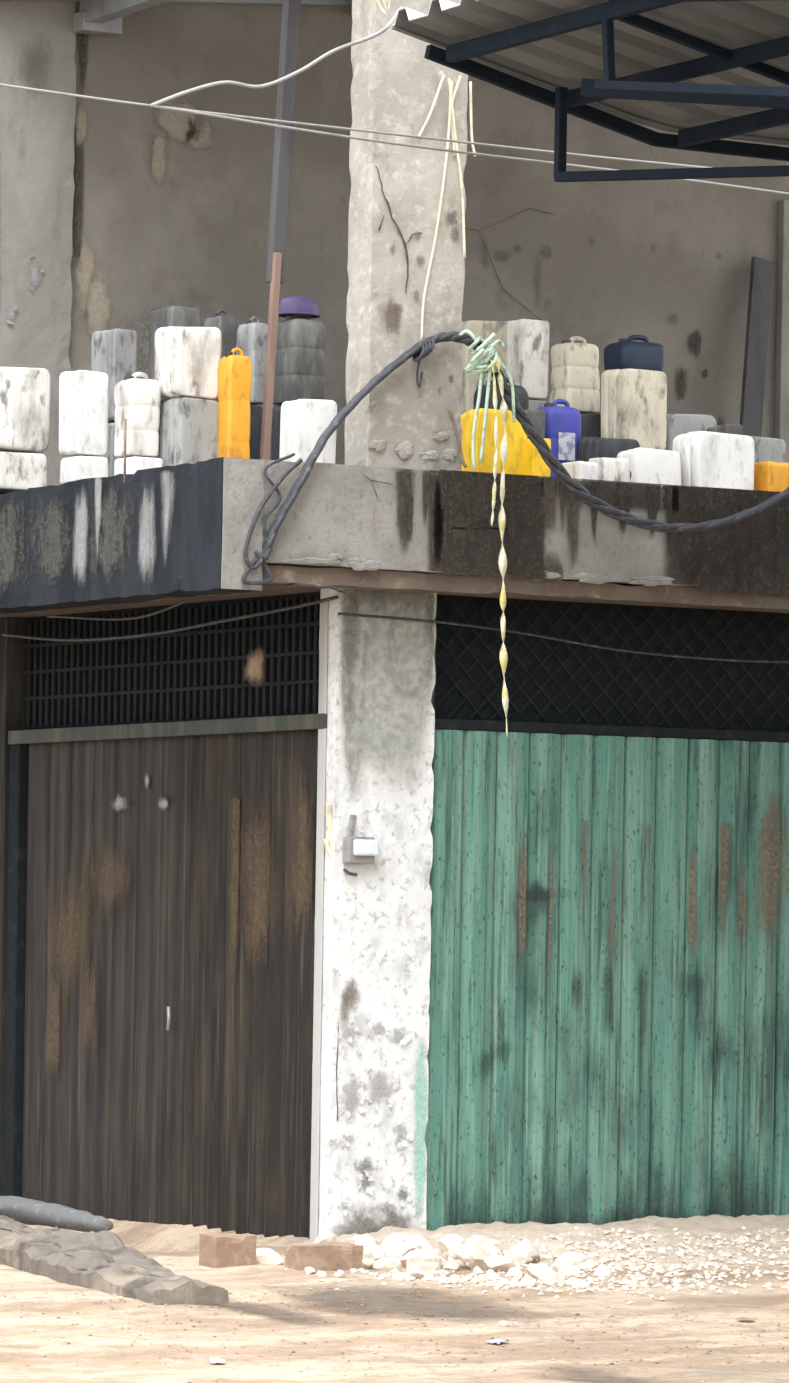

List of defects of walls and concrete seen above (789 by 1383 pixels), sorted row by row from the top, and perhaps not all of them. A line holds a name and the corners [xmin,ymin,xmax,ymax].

water stain [0,472,173,588]
water stain [396,469,789,597]
rust [229,797,275,965]
rust [289,777,312,928]
rust [518,850,527,951]
rust [688,855,696,955]
rust [720,803,782,938]
peeling [338,1022,410,1046]
peeling [338,1069,400,1217]
peeling [393,1124,414,1149]
peeling [396,1185,413,1207]